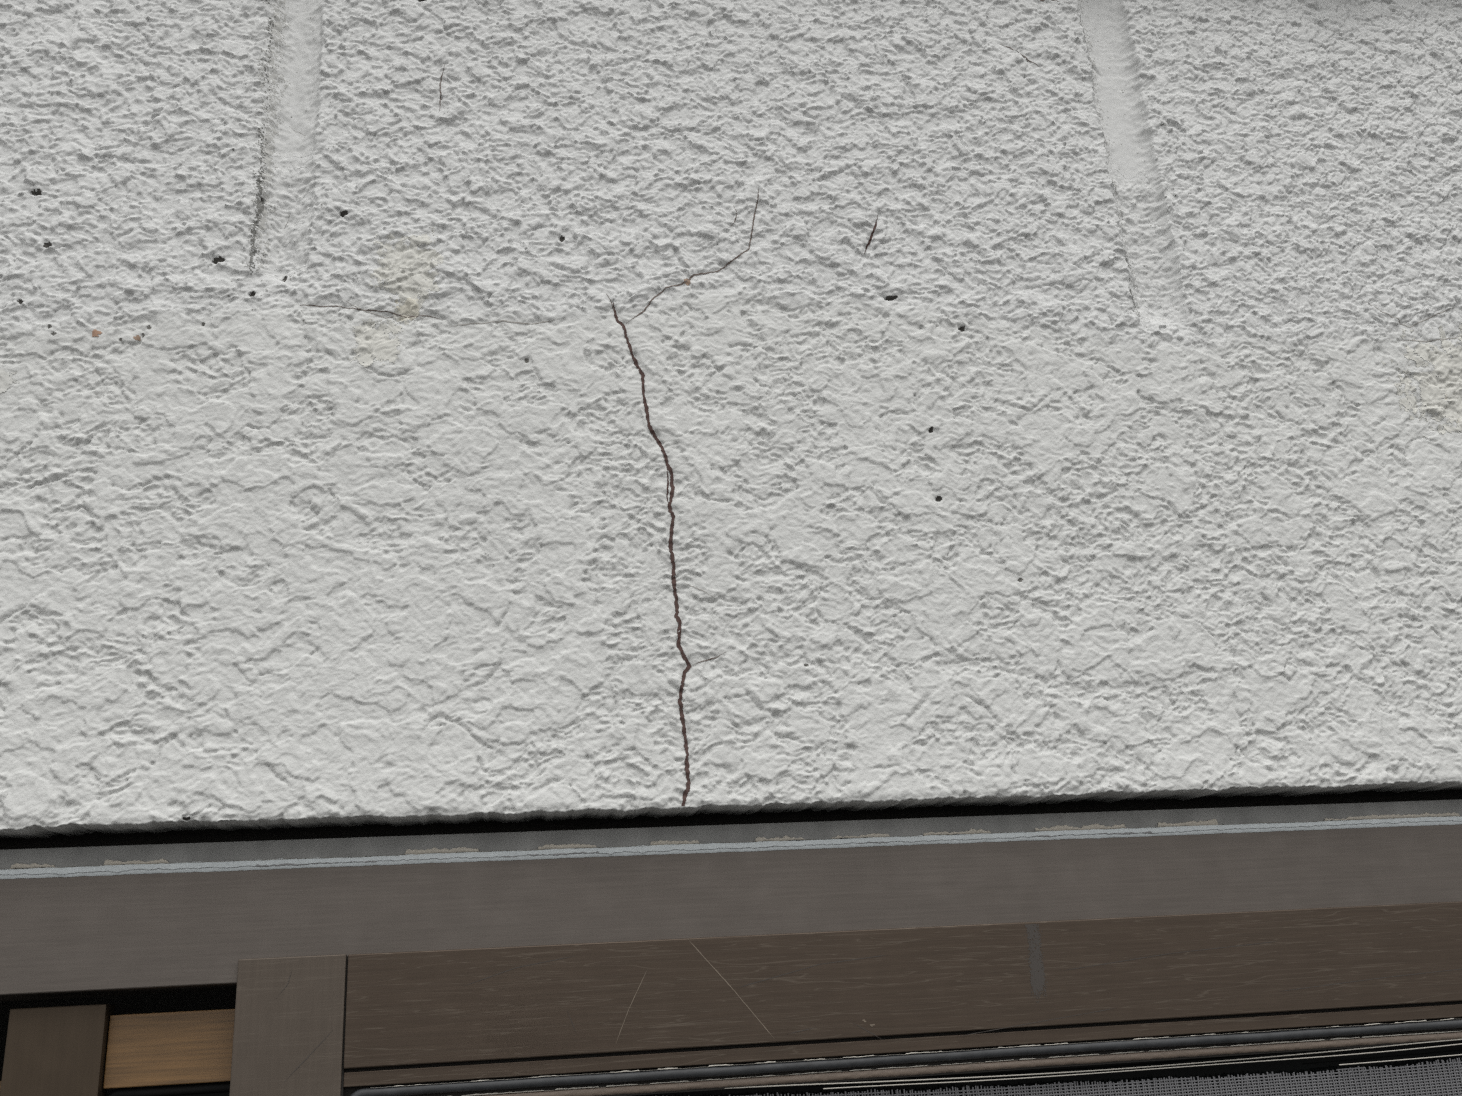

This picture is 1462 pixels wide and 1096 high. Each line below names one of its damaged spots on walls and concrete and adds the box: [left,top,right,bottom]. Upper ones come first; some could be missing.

crack [307,298,560,327]
crack [606,188,759,806]